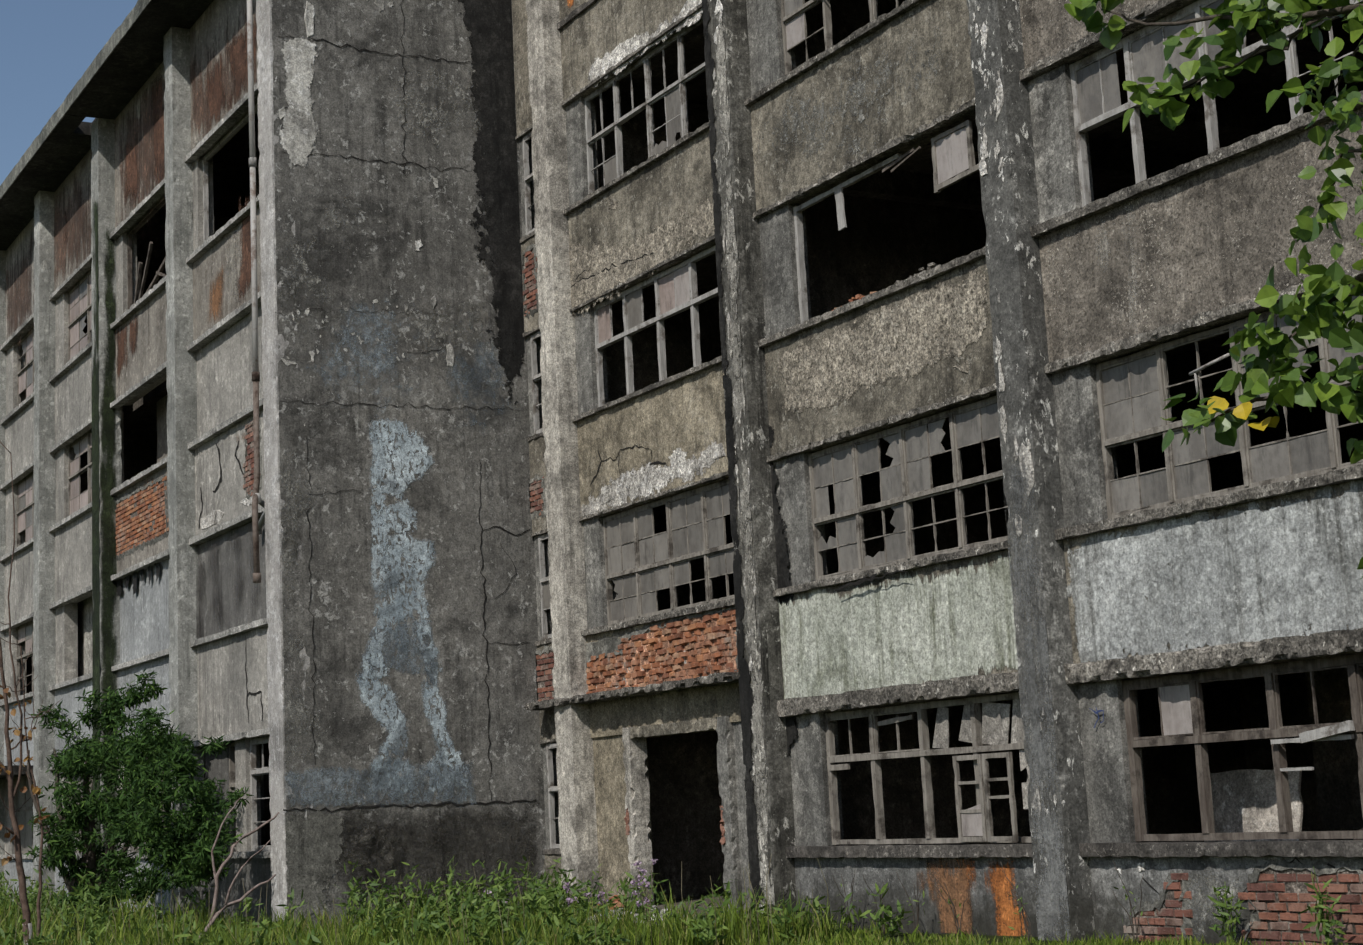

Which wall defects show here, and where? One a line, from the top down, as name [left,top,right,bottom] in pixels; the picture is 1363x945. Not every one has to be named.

rust [119,68,165,220]
rust [190,12,257,145]
peeling [278,1,317,168]
crack [278,0,470,178]
flaking render [588,0,730,160]
water stain [92,202,160,746]
flaking render [115,475,169,561]
crack [590,445,666,485]
flaking render [569,174,775,911]
rust [922,857,1026,936]
flaking render [1123,857,1363,945]